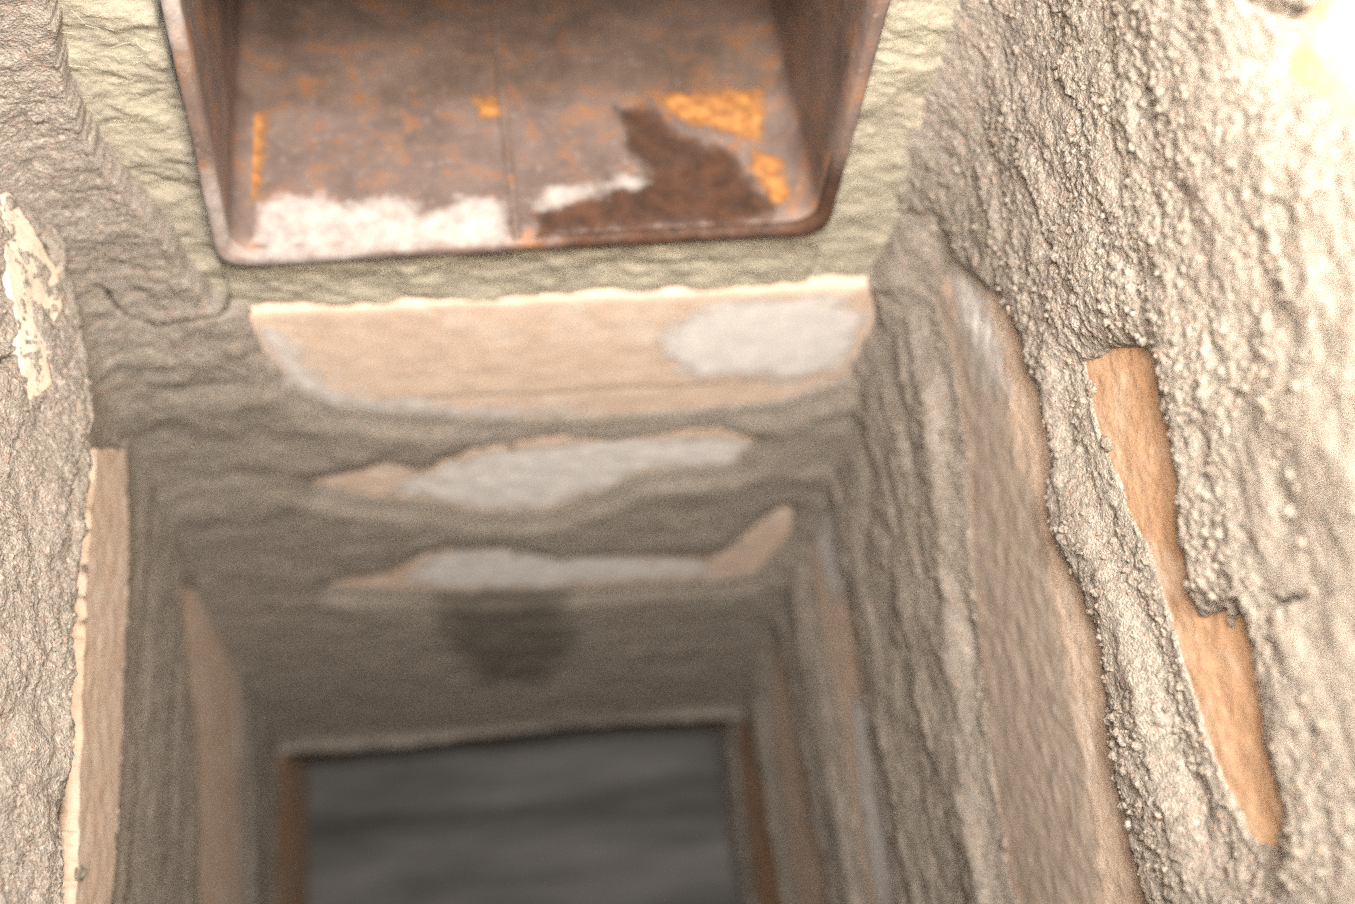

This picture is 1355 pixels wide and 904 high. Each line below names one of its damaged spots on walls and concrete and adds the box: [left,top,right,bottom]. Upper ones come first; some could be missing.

corrosion [476,98,500,117]
corrosion [251,114,266,196]
corrosion [538,90,841,249]
spalling [314,427,755,513]
spalling [328,506,792,592]
spalling [1086,347,1285,846]